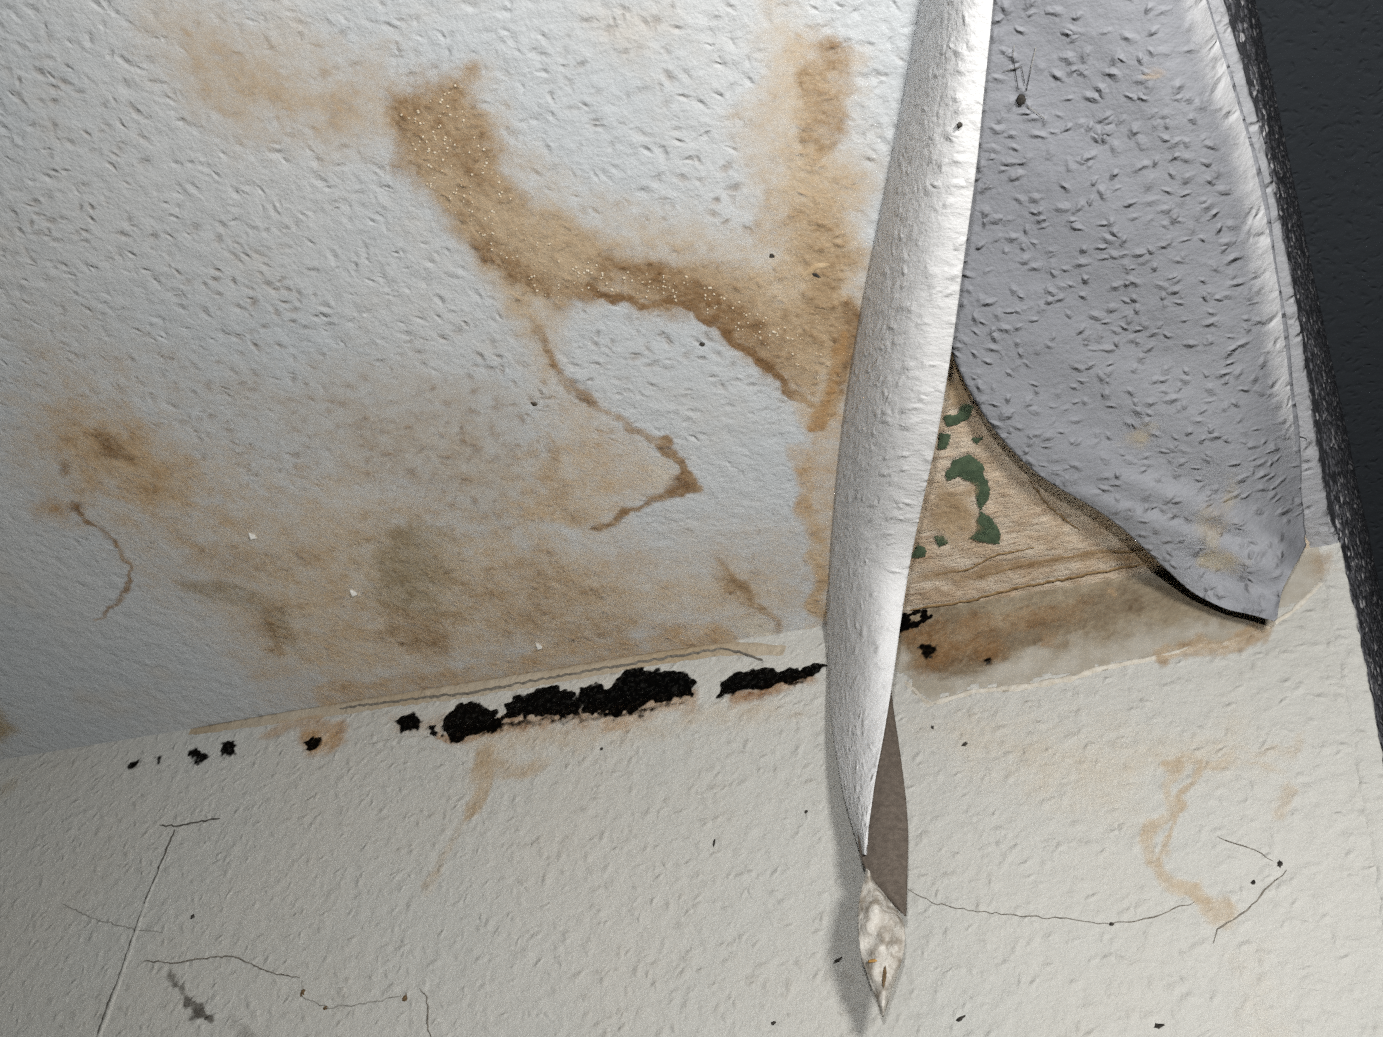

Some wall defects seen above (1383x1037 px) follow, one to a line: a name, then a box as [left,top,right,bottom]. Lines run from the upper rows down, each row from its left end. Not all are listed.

damp [19,396,201,621]
damp [175,15,873,822]
flaking render [902,352,1167,614]
damp [894,547,1330,707]
crack [908,889,1195,926]
damp [1012,740,1236,927]
crack [1213,837,1287,943]